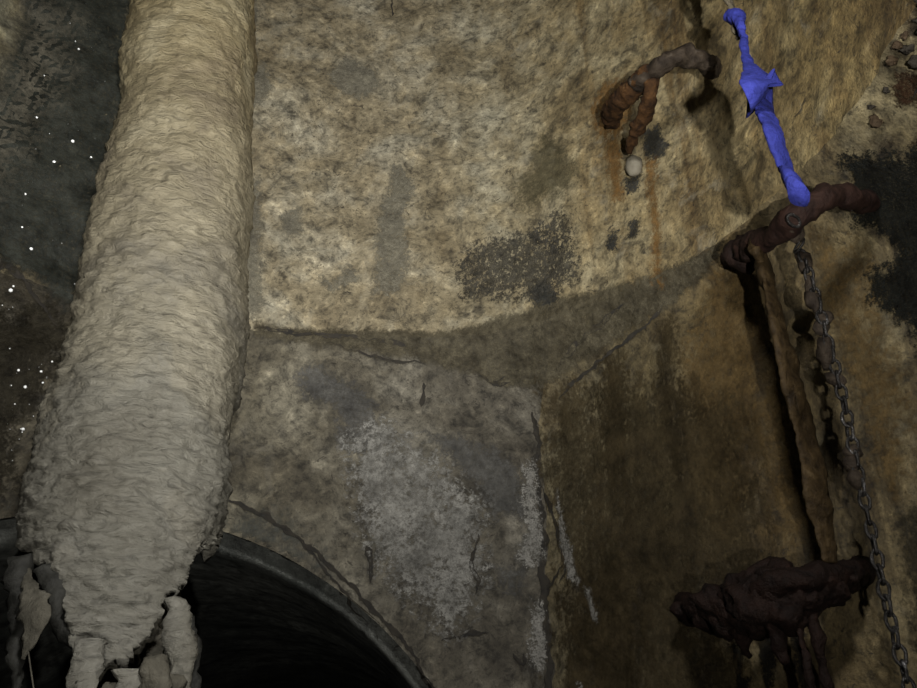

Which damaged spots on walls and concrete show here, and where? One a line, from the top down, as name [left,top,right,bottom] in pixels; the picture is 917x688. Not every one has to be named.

corrosion [591,78,660,200]
leakage [836,144,917,359]
leakage [234,177,770,688]